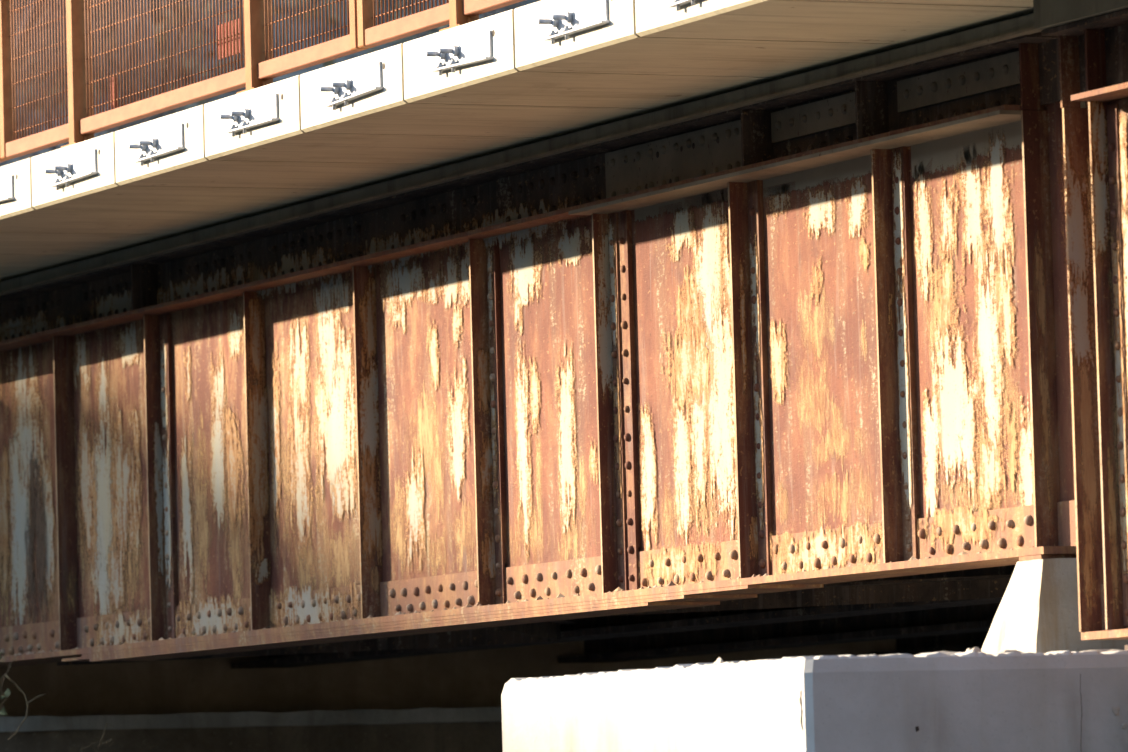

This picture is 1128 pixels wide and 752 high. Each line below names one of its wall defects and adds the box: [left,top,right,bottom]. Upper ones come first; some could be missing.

corrosion [192,412,210,596]
peeling [0,196,622,646]
corrosion [282,438,379,592]
corrosion [393,479,405,573]
corrosion [413,382,477,576]
corrosion [511,442,542,563]
corrosion [558,456,586,560]
corrosion [691,464,716,534]
corrosion [798,290,865,526]
corrosion [946,406,1017,512]
corrosion [1035,239,1052,511]
peeling [1058,101,1128,573]